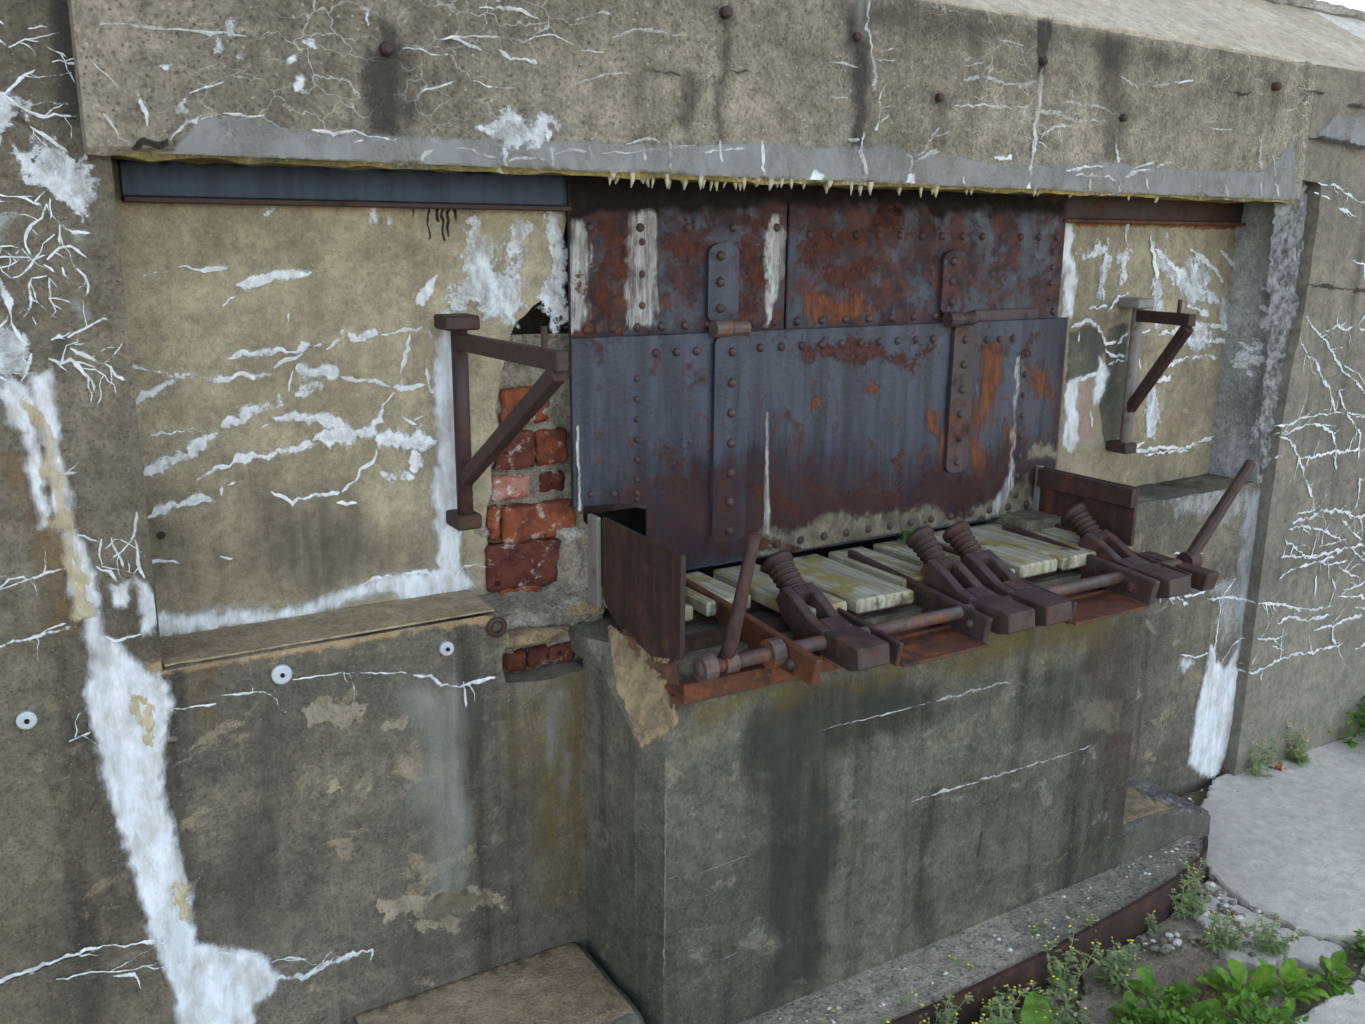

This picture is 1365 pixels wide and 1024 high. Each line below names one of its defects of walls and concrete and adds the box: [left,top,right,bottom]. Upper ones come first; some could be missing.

crack [0,21,264,152]
crack [0,183,437,579]
spalling [474,333,678,748]
corrosion [575,214,631,332]
damp [413,170,1133,451]
corrosion [614,333,1061,563]
corrosion [800,287,939,371]
crack [1160,242,1365,680]
damp [0,327,474,1024]
damp [1188,645,1238,779]
crack [0,935,165,989]
peeling [374,885,506,935]